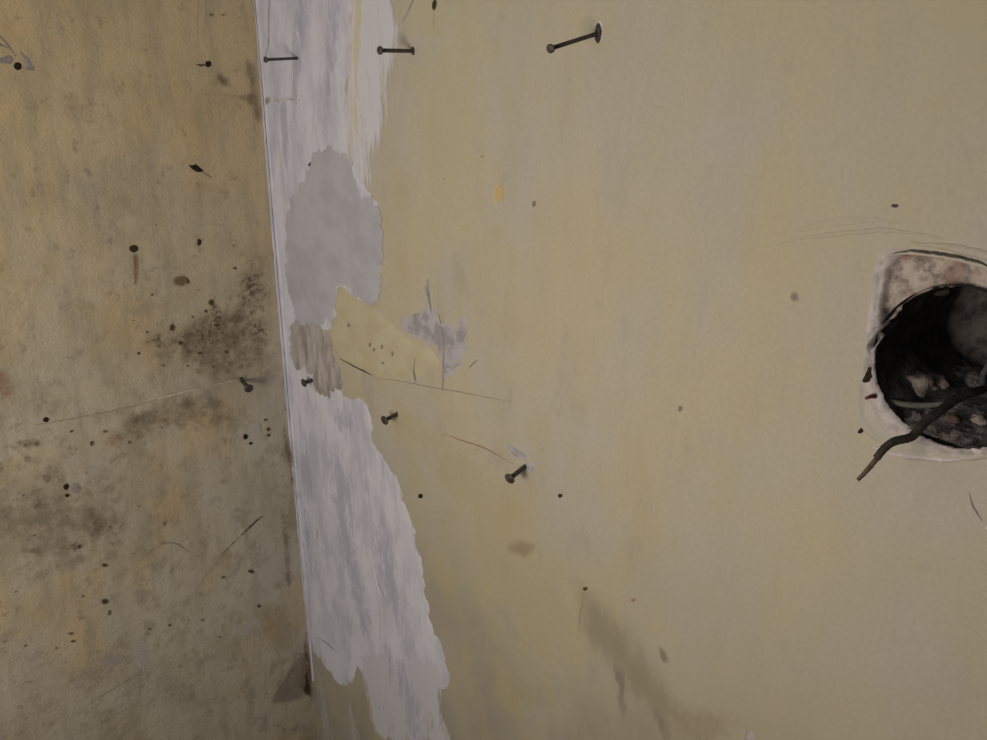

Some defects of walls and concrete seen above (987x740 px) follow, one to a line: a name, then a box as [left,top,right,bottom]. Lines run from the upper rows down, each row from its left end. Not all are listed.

leakage [137,267,266,374]
peeling [254,0,467,740]
spalling [774,215,987,463]